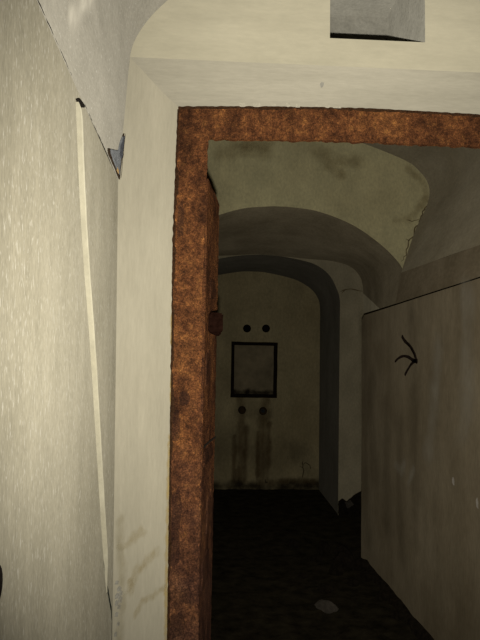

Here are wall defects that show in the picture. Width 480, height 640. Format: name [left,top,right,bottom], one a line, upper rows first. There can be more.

flaking render [107,133,126,179]
corrosion [165,106,480,640]